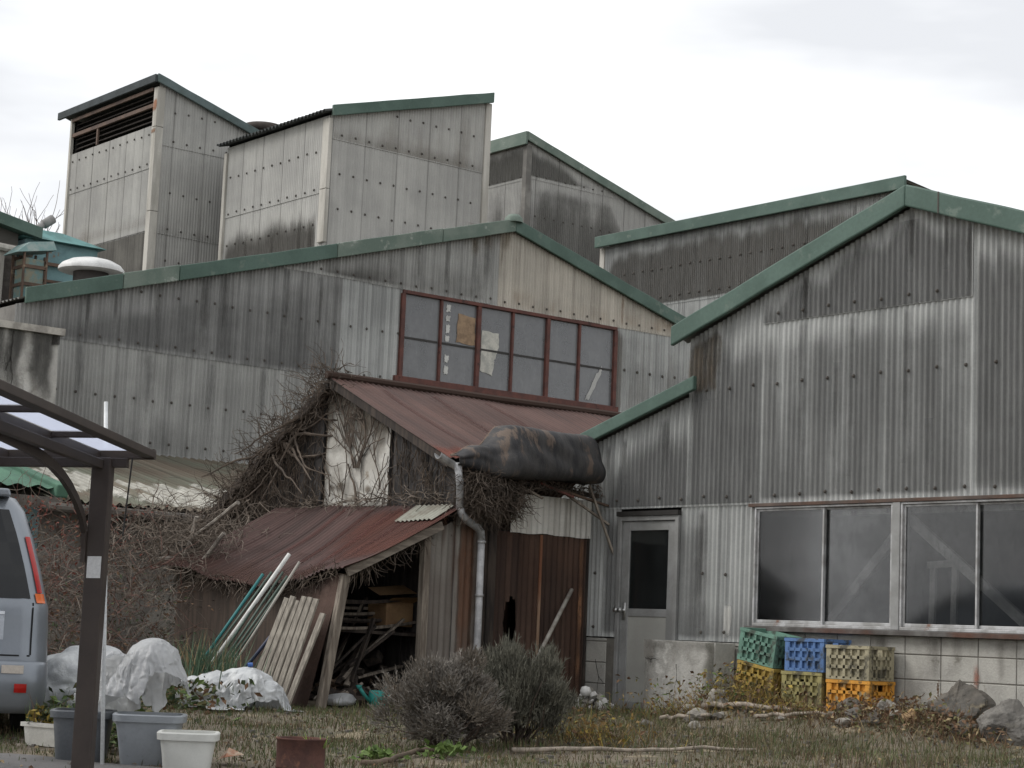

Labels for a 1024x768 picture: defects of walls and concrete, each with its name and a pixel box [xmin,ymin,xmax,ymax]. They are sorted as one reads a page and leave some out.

leakage [489,152,577,186]
leakage [225,225,314,259]
leakage [535,201,615,266]